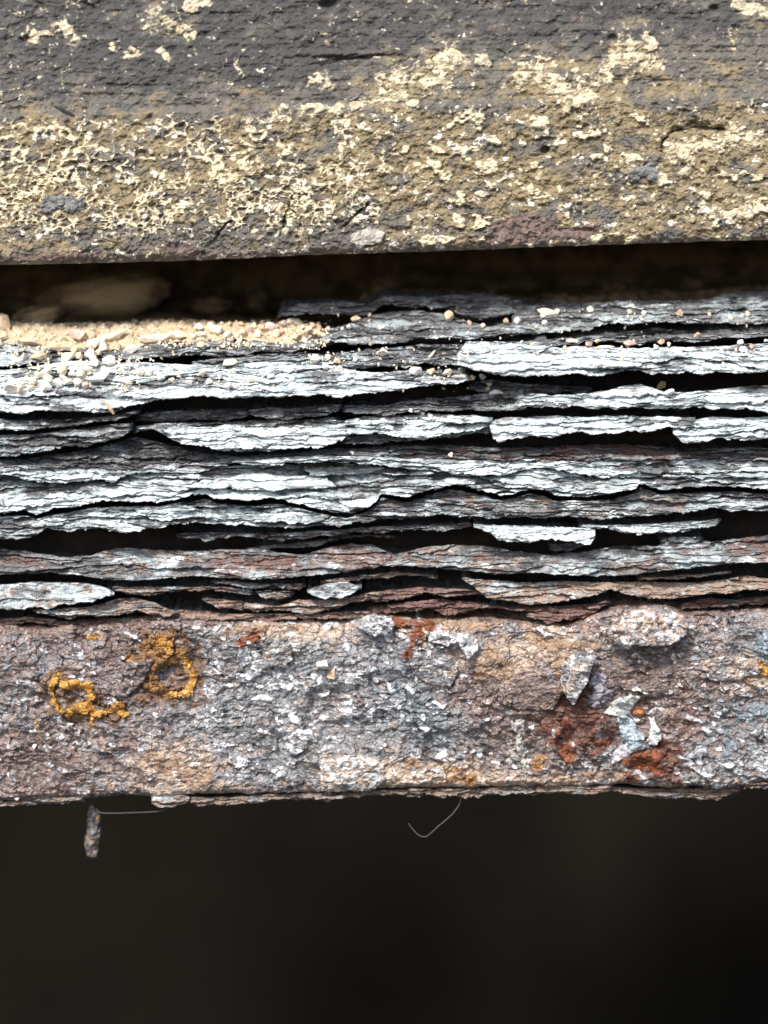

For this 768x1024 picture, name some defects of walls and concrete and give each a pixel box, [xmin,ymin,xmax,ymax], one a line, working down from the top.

spalling [0,313,11,331]
spalling [266,318,322,336]
spalling [17,329,89,350]
spalling [102,327,187,353]
spalling [409,350,452,376]
spalling [90,368,111,382]
spalling [657,381,675,396]
corrosion [0,288,768,739]
corrosion [143,632,768,808]